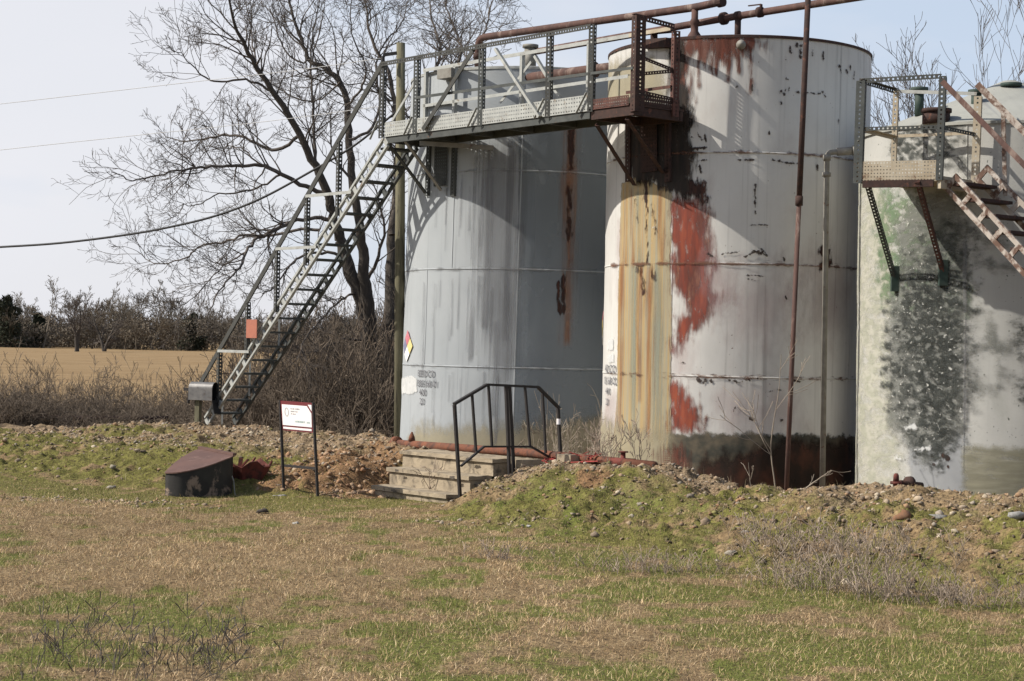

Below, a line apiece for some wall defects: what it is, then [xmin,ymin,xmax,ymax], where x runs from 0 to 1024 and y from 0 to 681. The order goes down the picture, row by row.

rust [503,129,575,341]
leakage [688,177,711,205]
rust [610,196,857,353]
leakage [880,192,1024,491]
rust [653,373,856,489]